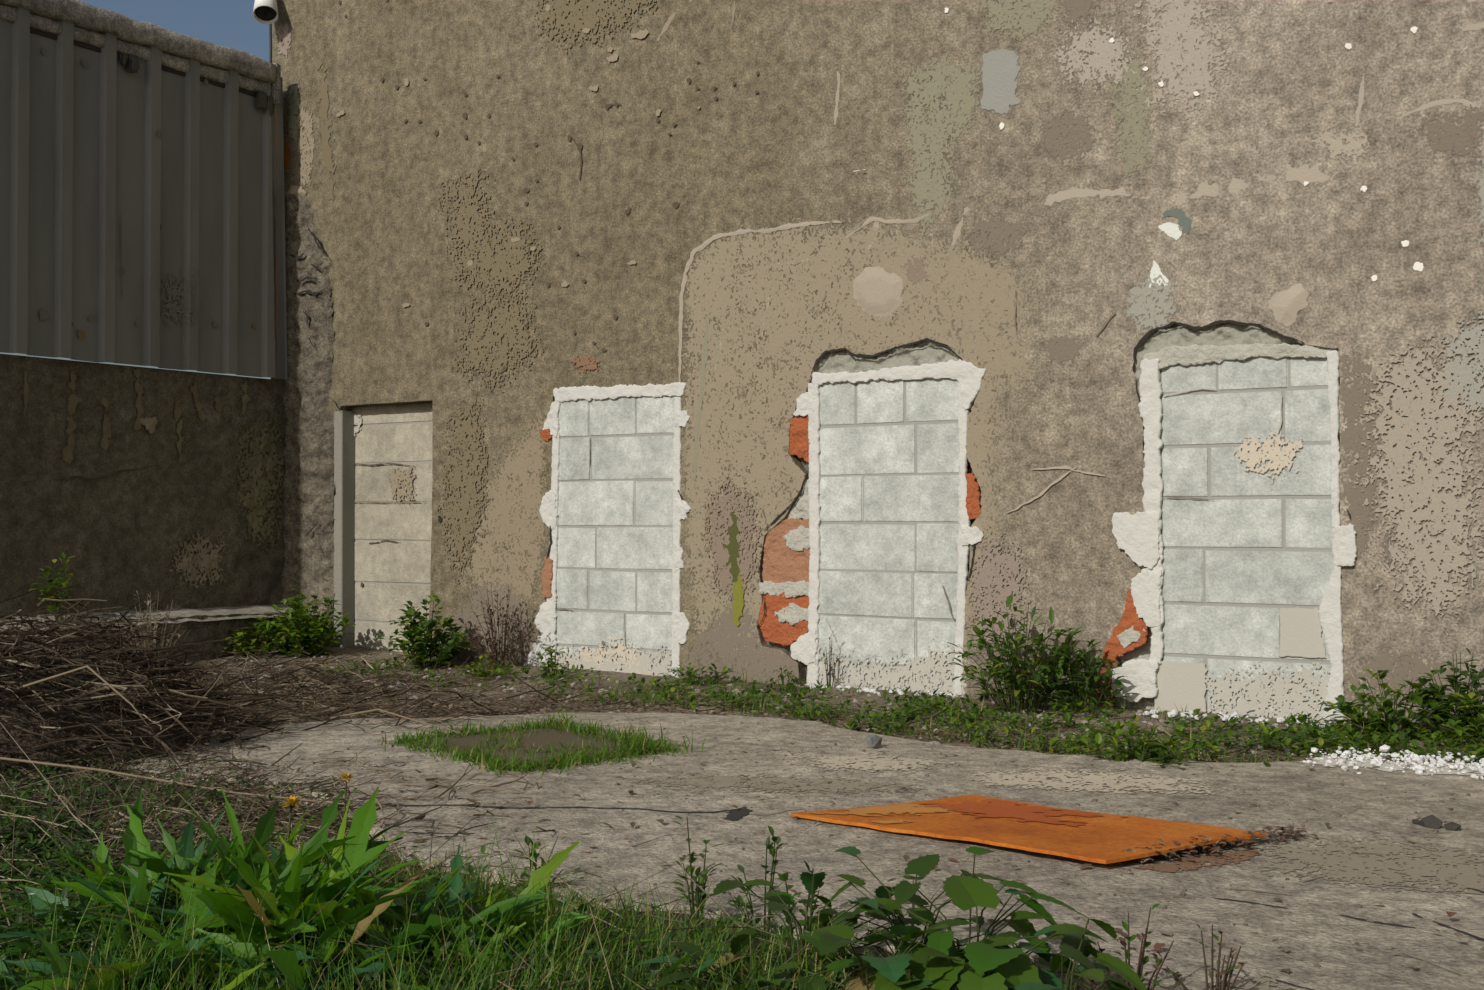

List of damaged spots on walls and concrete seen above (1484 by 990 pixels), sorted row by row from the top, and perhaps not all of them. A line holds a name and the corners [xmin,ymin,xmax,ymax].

flaking render [539,429,552,442]
flaking render [789,415,810,463]
flaking render [964,473,981,520]
flaking render [541,557,553,598]
flaking render [758,518,810,647]
flaking render [1095,589,1149,707]